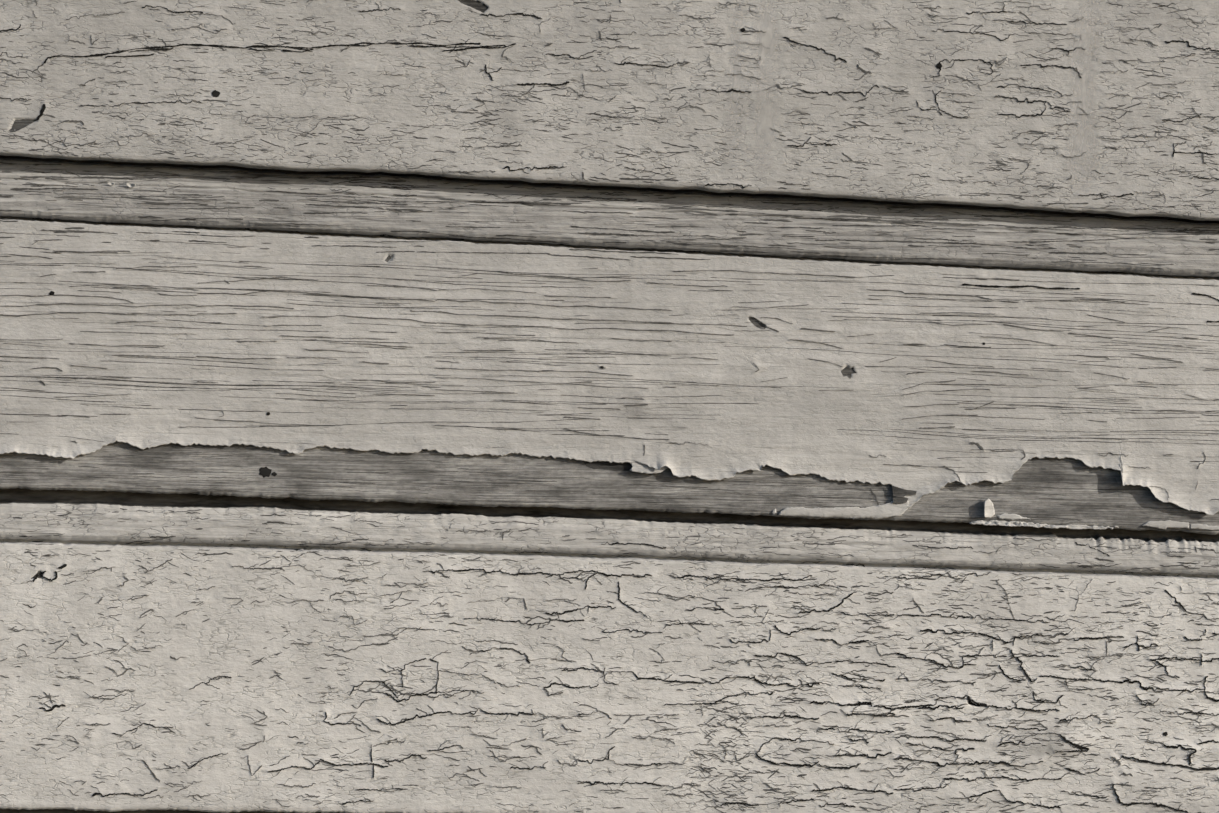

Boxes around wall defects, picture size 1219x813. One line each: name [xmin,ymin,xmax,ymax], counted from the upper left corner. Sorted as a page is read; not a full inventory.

peeling [9,119,37,132]
crack [0,0,1219,505]
peeling [0,441,1219,535]
crack [0,508,1219,813]